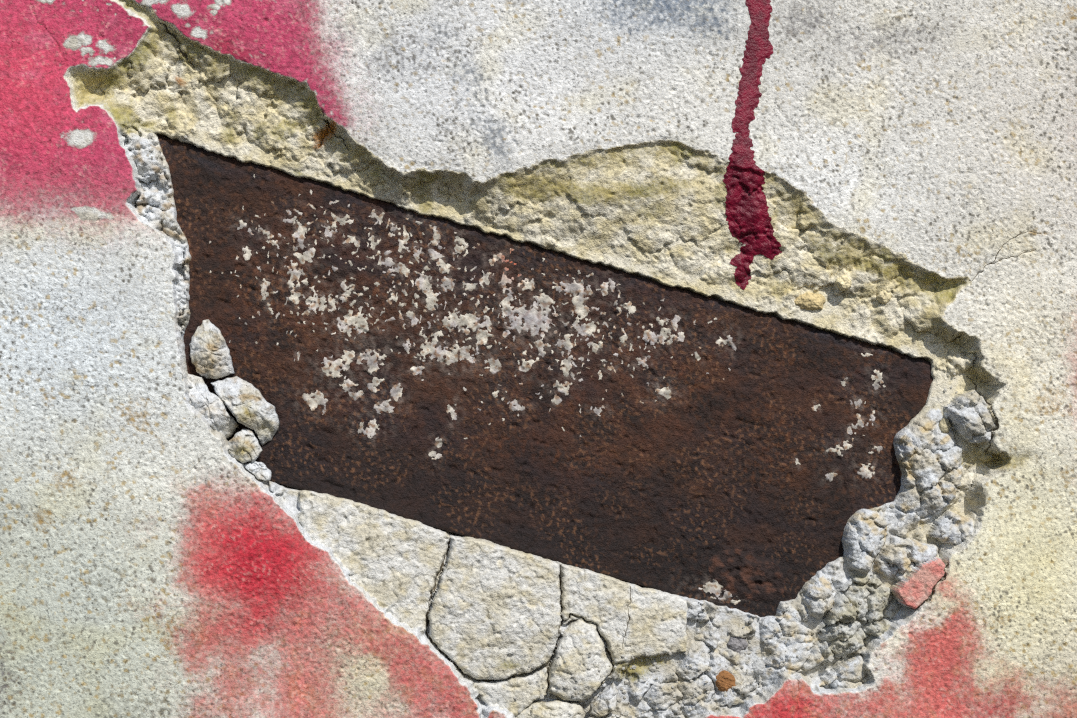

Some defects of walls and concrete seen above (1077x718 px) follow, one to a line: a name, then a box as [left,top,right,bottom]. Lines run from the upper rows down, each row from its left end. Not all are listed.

peeling [63,33,94,56]
peeling [61,129,94,148]
peeling [236,203,685,415]
peeling [871,370,886,390]
peeling [358,383,403,439]
peeling [492,384,525,421]
peeling [826,399,875,456]
peeling [428,437,442,460]
peeling [857,446,883,479]
peeling [699,579,740,605]
corrosion [708,549,785,601]
crack [425,533,632,692]